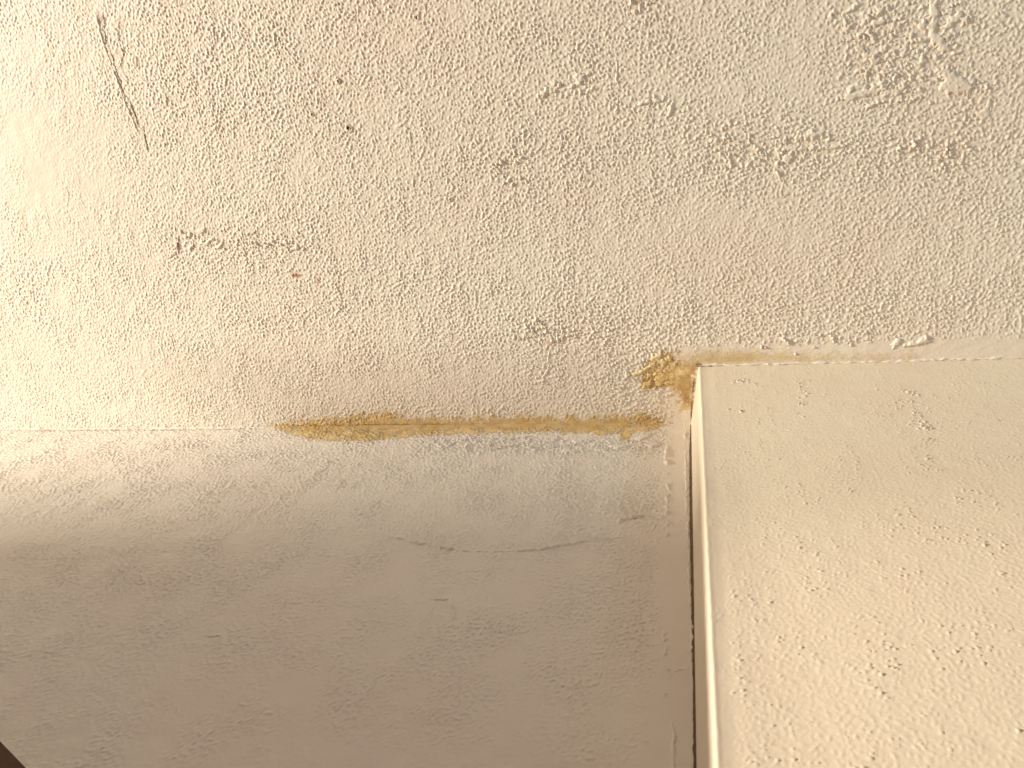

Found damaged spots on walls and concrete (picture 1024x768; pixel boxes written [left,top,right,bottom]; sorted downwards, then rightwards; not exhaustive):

crack [95,12,148,151]
water stain [623,351,761,412]
water stain [269,411,672,443]